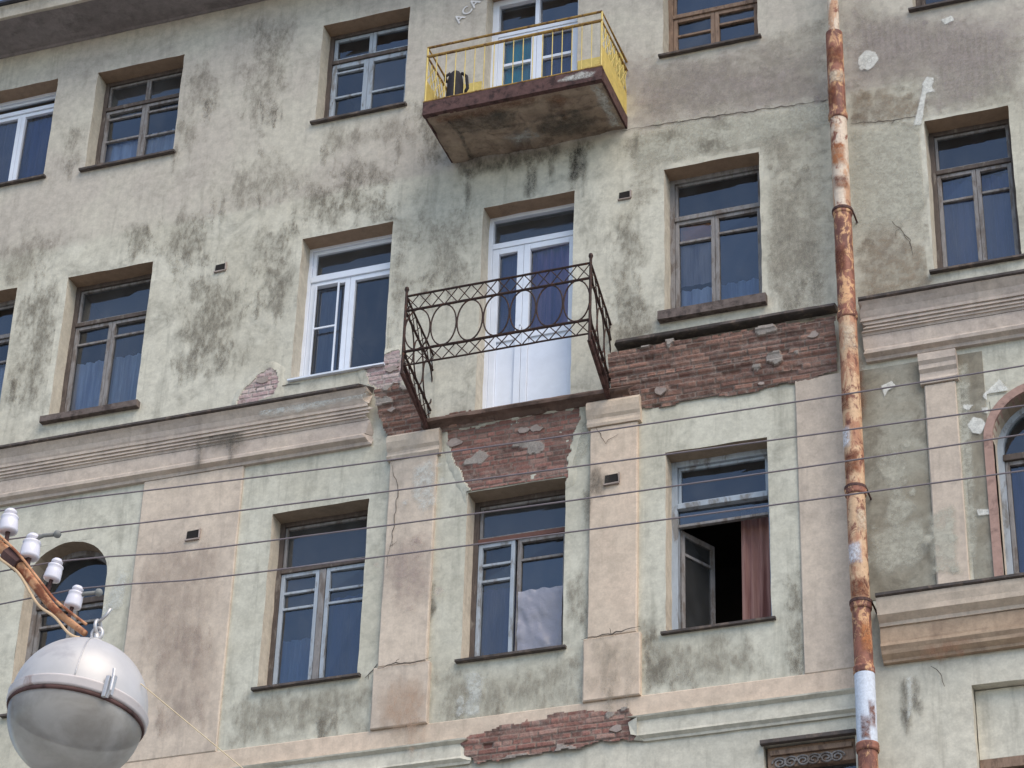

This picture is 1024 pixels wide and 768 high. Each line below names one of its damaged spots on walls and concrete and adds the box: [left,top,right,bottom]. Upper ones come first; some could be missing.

peeling [858,50,878,70]
rust [835,249,845,271]
water stain [188,281,236,372]
spalling [608,303,855,408]
spalling [232,345,424,436]
spalling [403,407,587,507]
rust [845,451,858,472]
flaking render [956,351,1009,579]
crack [584,626,640,639]
crack [365,657,431,678]
spalling [460,707,637,764]
rust [861,706,875,737]